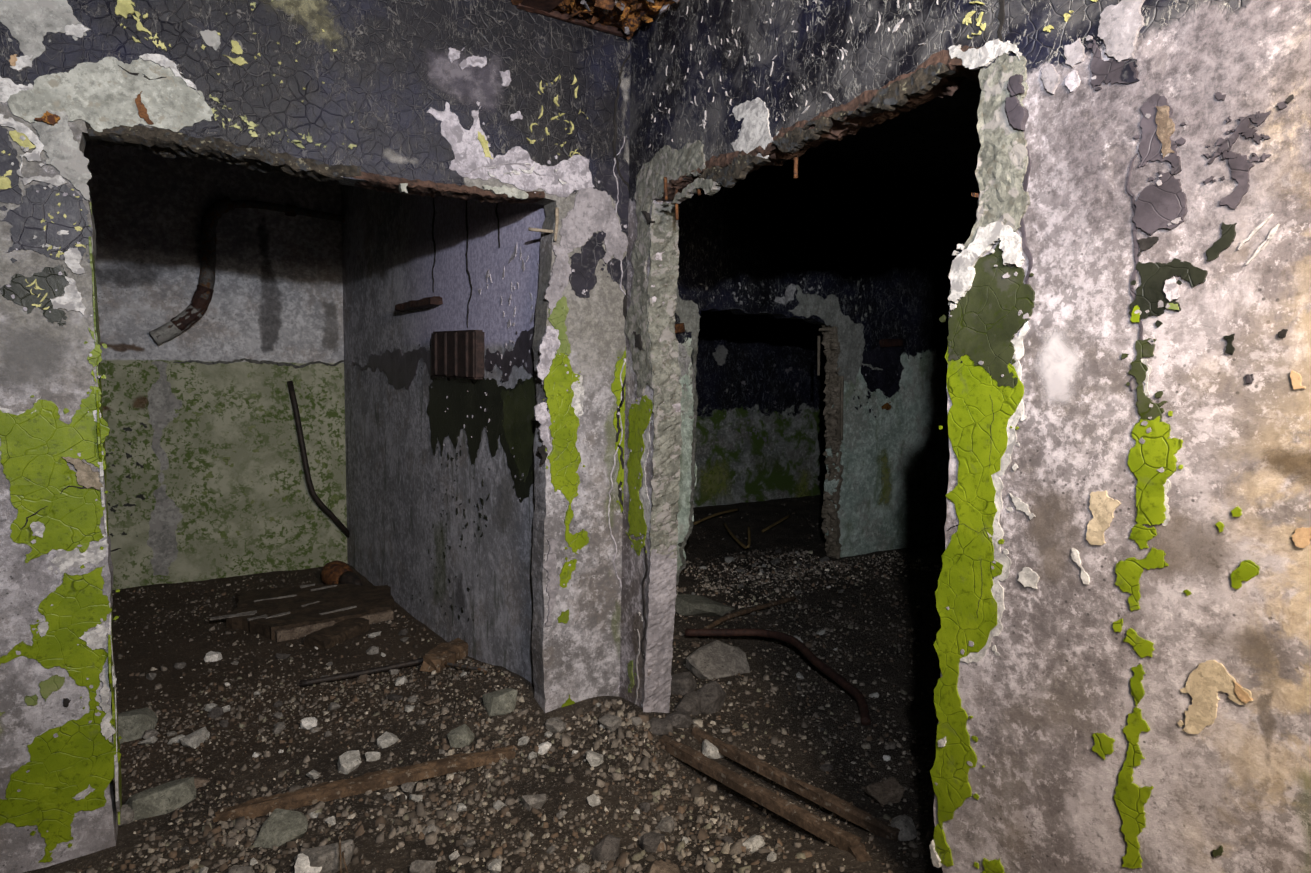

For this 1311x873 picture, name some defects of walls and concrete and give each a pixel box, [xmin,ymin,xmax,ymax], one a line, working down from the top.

peeling [0,0,362,863]
peeling [351,0,1145,868]
peeling [1071,93,1294,869]
damp [1265,450,1311,483]
damp [1146,514,1229,573]
damp [1235,631,1276,665]
damp [1259,695,1276,741]
peeling [974,858,1005,873]